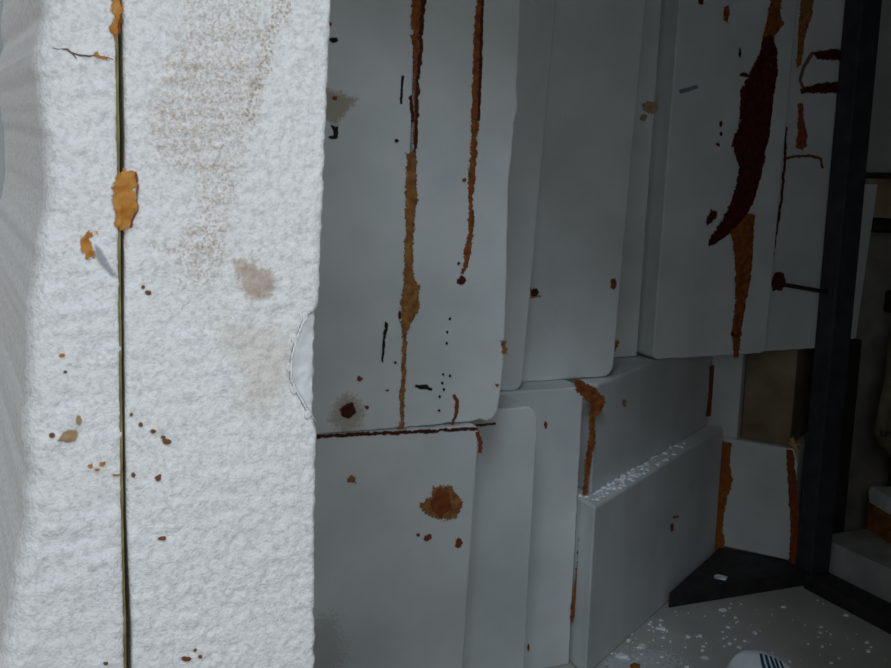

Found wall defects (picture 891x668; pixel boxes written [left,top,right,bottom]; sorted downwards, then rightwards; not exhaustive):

corrosion [109,0,124,41]
corrosion [785,0,841,168]
corrosion [111,168,139,231]
corrosion [316,0,496,453]
corrosion [706,0,786,359]
spalling [286,311,316,421]
corrosion [574,378,606,495]
corrosion [420,485,463,521]
corrosion [714,441,733,552]
corrosion [786,450,800,565]
corrosion [570,538,579,621]